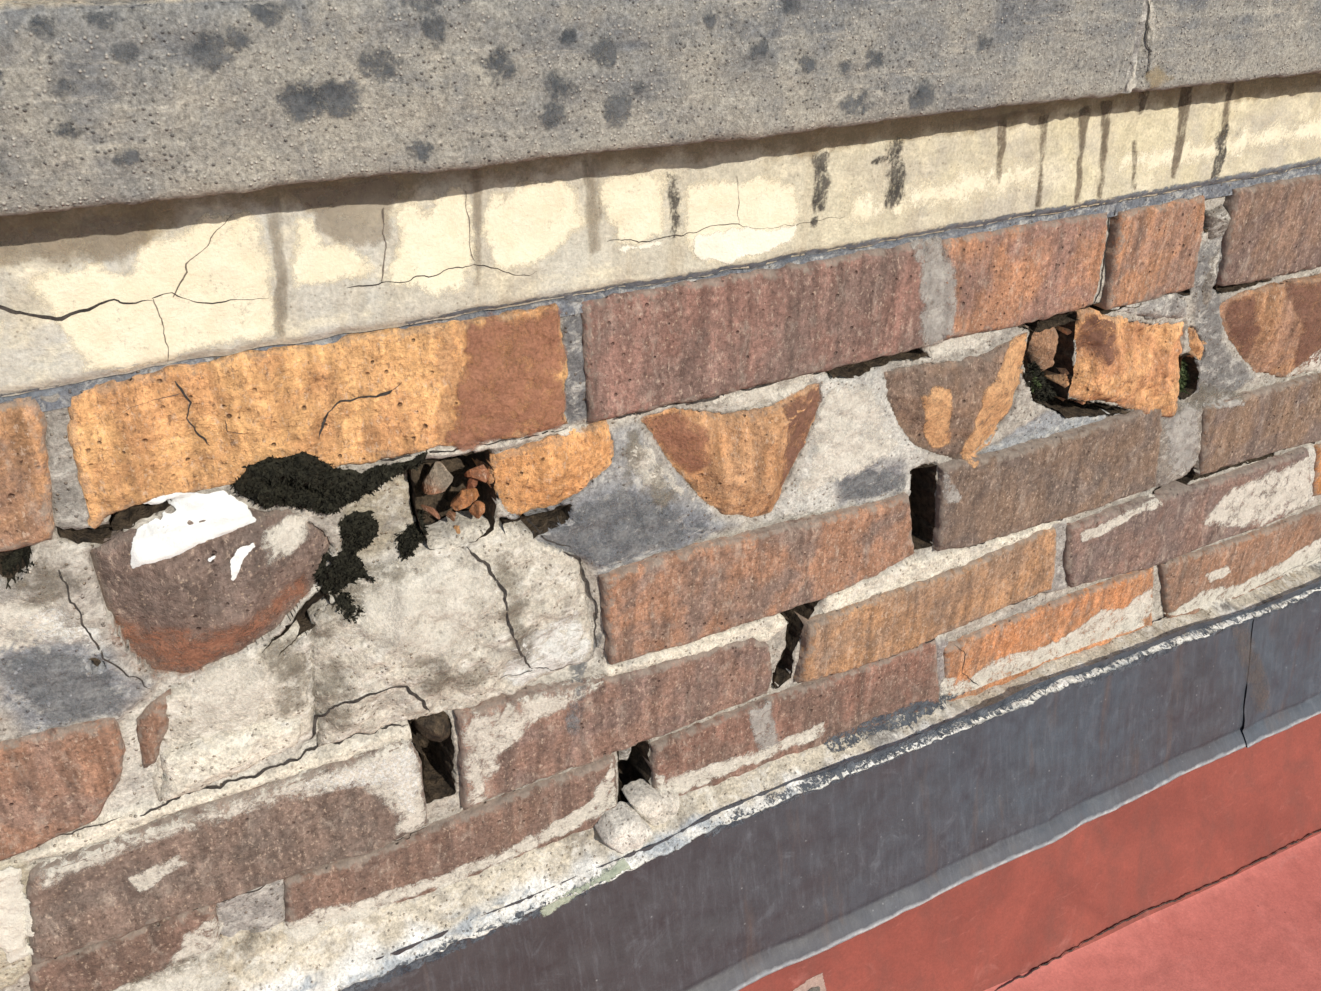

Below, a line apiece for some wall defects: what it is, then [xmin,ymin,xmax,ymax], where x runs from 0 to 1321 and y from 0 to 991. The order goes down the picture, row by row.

water stain [685,62,1321,207]
water stain [0,199,177,261]
crack [348,191,537,288]
water stain [233,146,667,244]
crack [0,215,267,446]
spalling [30,211,614,673]
spalling [641,302,1207,550]
crack [58,570,150,689]
crack [467,518,598,678]
peeling [772,600,820,689]
peeling [408,715,456,804]
peeling [617,741,651,803]